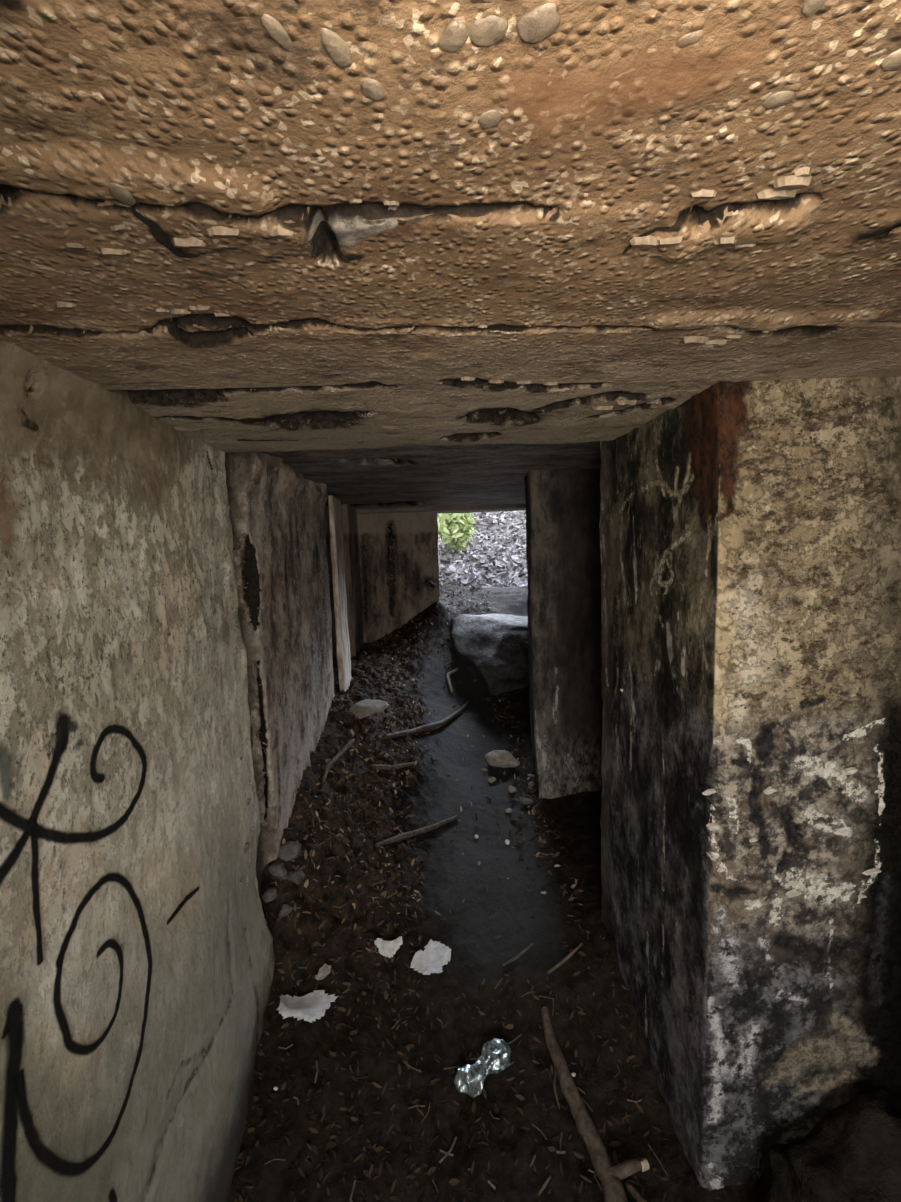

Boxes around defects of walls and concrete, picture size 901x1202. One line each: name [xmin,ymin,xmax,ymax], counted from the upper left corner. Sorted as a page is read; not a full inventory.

crack [0,184,560,261]
spalling [120,381,404,441]
spalling [440,377,676,442]
rust [684,381,750,531]
leakage [599,496,642,771]
leakage [655,611,686,677]
leakage [646,923,664,979]